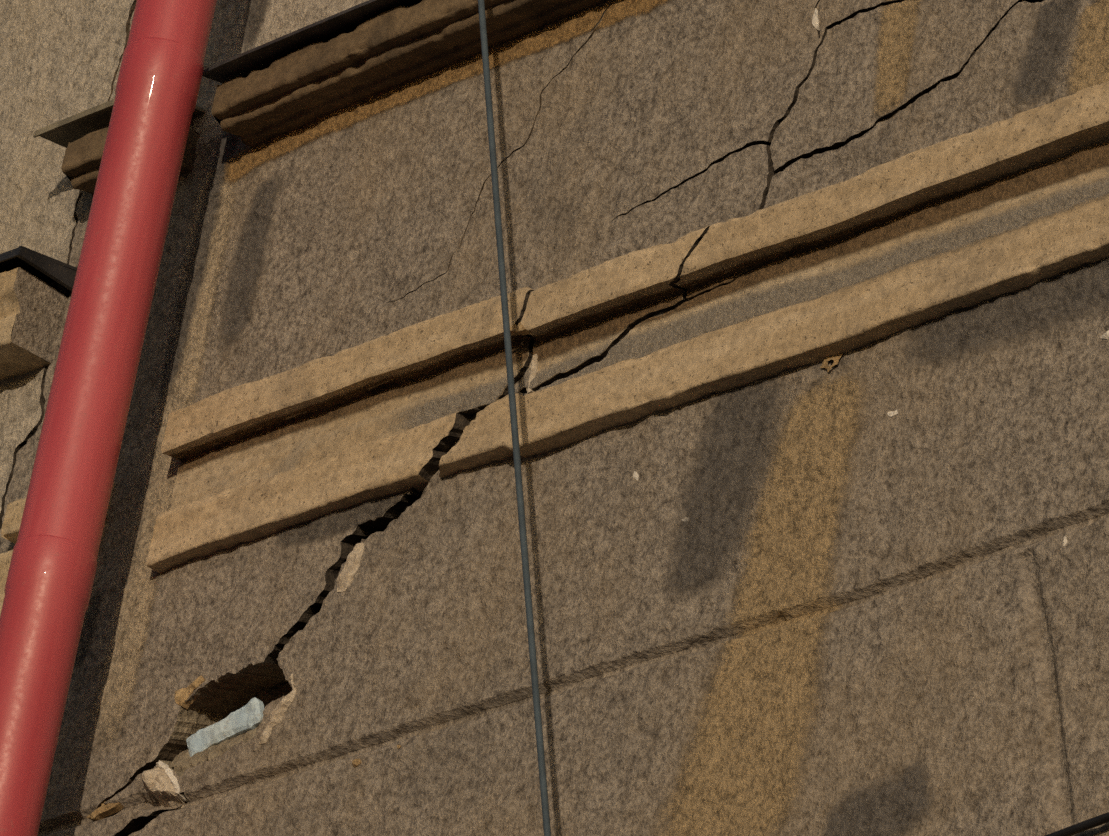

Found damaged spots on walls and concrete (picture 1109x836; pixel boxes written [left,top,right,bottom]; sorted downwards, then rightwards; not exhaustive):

crack [65,190,83,298]
crack [107,0,137,102]
crack [387,25,598,303]
crack [612,0,1044,221]
crack [0,361,49,529]
crack [264,226,753,665]
damp [96,143,1109,737]
damp [666,377,859,836]
crack [87,738,189,836]
hole [160,662,297,777]